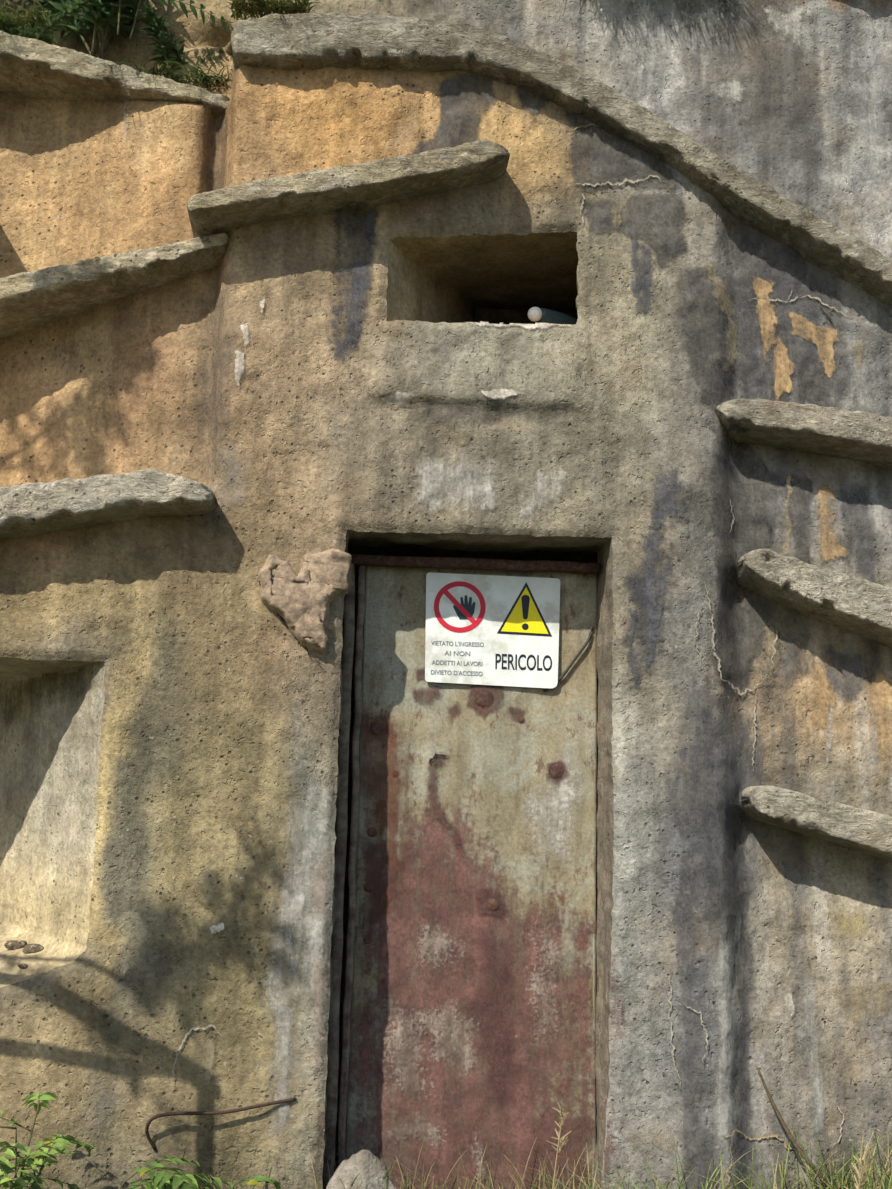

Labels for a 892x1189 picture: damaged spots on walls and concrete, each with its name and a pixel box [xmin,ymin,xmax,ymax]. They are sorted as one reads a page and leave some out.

damp [329,201,378,360]
damp [411,73,556,154]
crack [576,174,667,223]
damp [566,105,687,313]
damp [673,213,857,410]
peeling [753,278,838,399]
crack [747,290,853,329]
damp [419,461,495,509]
damp [626,469,689,687]
crack [693,581,778,772]
damp [666,417,813,1189]
rust [312,713,624,1189]